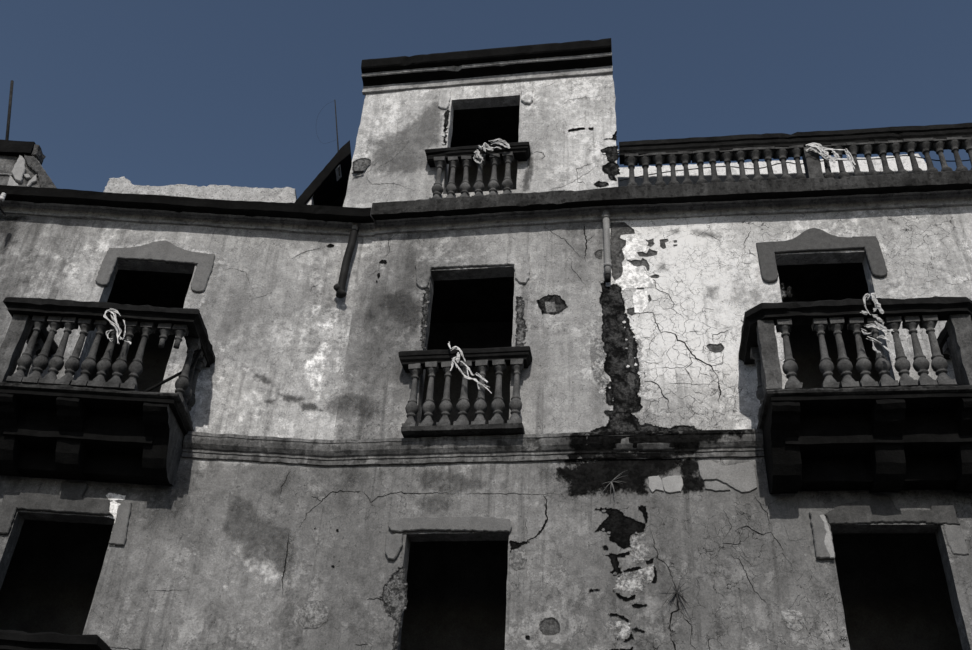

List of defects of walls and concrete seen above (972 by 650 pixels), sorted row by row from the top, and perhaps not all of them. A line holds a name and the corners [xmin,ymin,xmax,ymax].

flaking render [515,294,568,346]
flaking render [590,222,702,433]
crack [637,264,733,420]
flaking render [648,475,683,493]
flaking render [379,564,408,650]
crack [282,490,563,594]
flaking render [594,505,657,583]
flaking render [608,613,645,650]
flaking render [613,590,647,608]
crack [652,536,729,650]
crack [705,497,800,608]